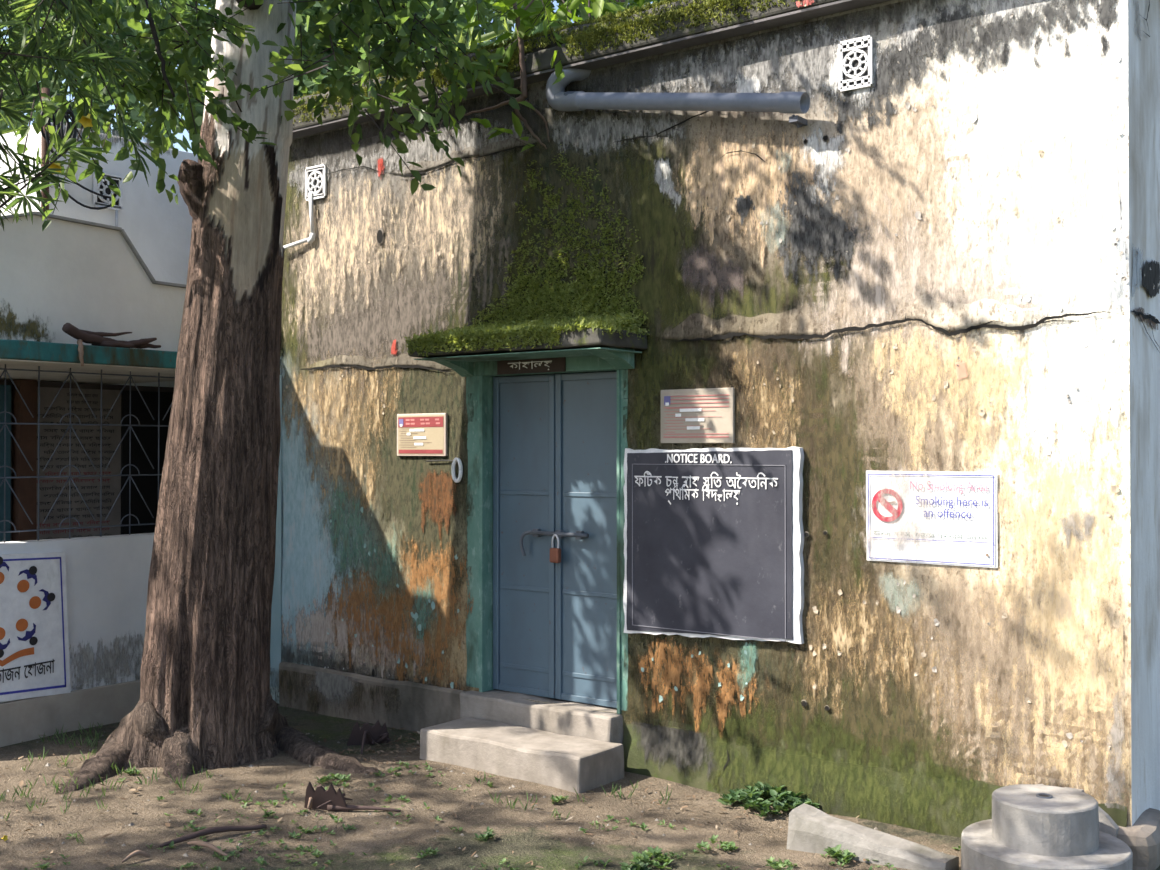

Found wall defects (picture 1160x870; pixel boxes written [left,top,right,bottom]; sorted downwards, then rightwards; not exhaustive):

water stain [565,0,1117,134]
water stain [777,171,865,310]
water stain [293,88,642,592]
crack [661,310,1160,353]
corrosion [418,470,457,539]
water stain [625,336,1129,816]